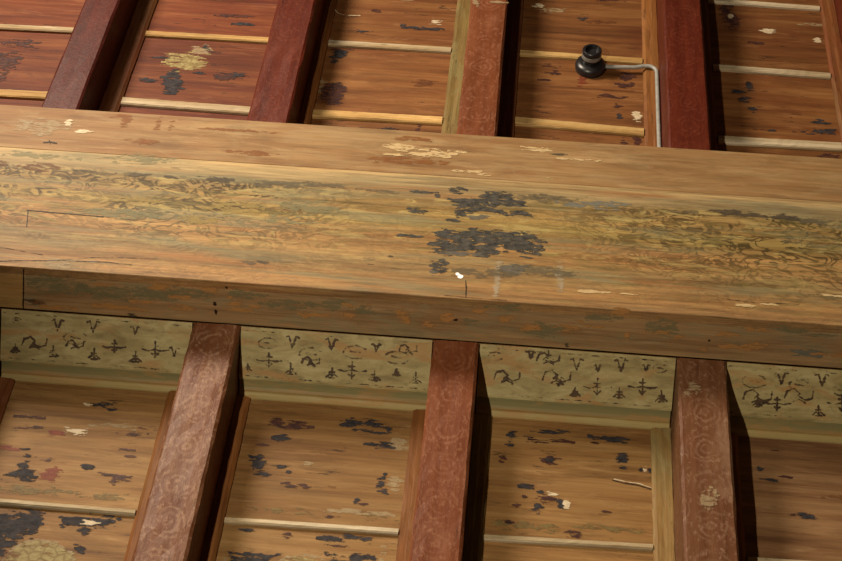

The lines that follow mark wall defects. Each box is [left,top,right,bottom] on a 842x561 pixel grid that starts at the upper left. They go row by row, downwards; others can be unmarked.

peeling [139,44,247,95]
peeling [397,187,576,278]
peeling [13,415,149,436]
peeling [248,418,315,488]
peeling [337,417,409,450]
peeling [504,429,575,447]
peeling [587,434,631,469]
peeling [0,445,132,500]
peeling [376,473,404,494]
peeling [512,483,571,514]
peeling [0,508,86,561]
peeling [58,513,122,536]